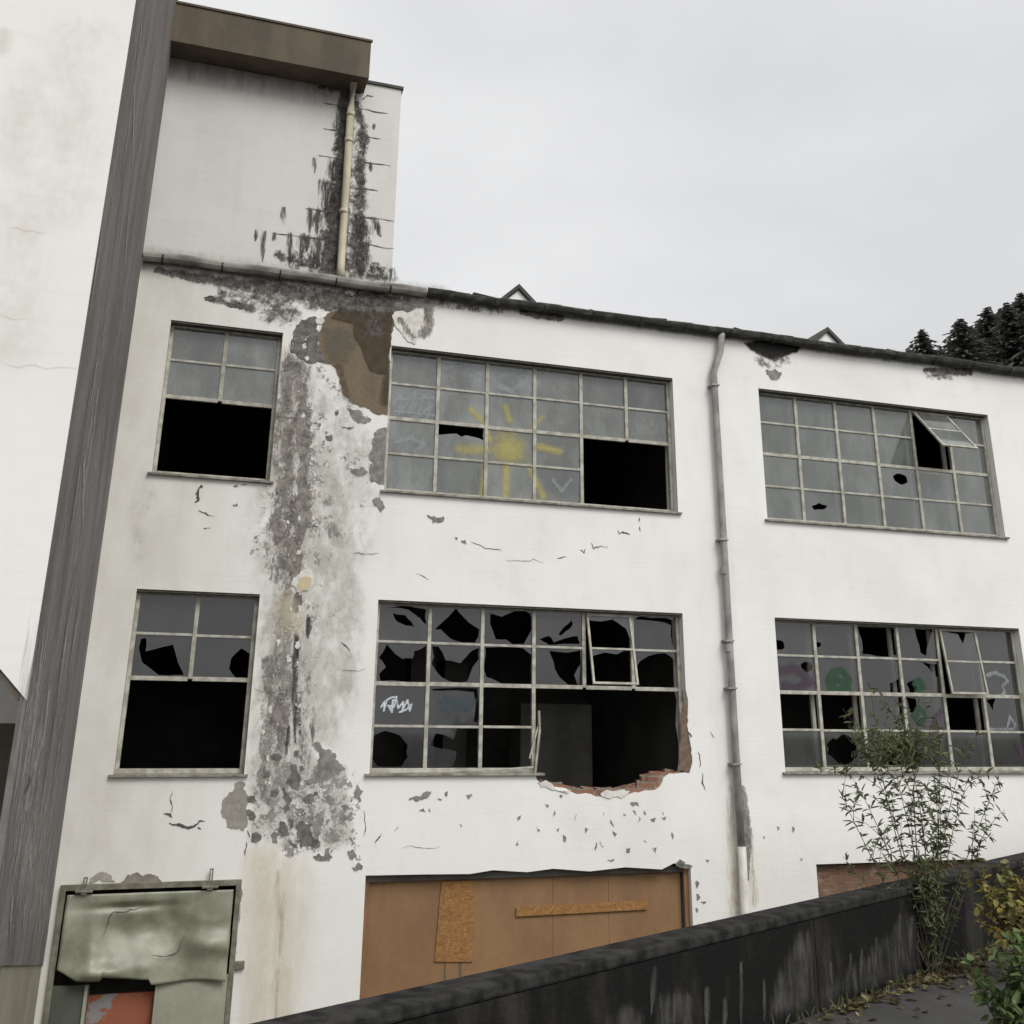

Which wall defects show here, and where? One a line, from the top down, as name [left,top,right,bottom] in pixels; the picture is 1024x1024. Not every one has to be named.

leakage [146,85,444,323]
leakage [519,309,564,322]
flaking render [745,340,800,380]
leakage [257,353,341,801]
flaking render [221,289,434,871]
crack [164,791,204,829]
peeling [409,791,448,811]
spalling [538,701,692,822]